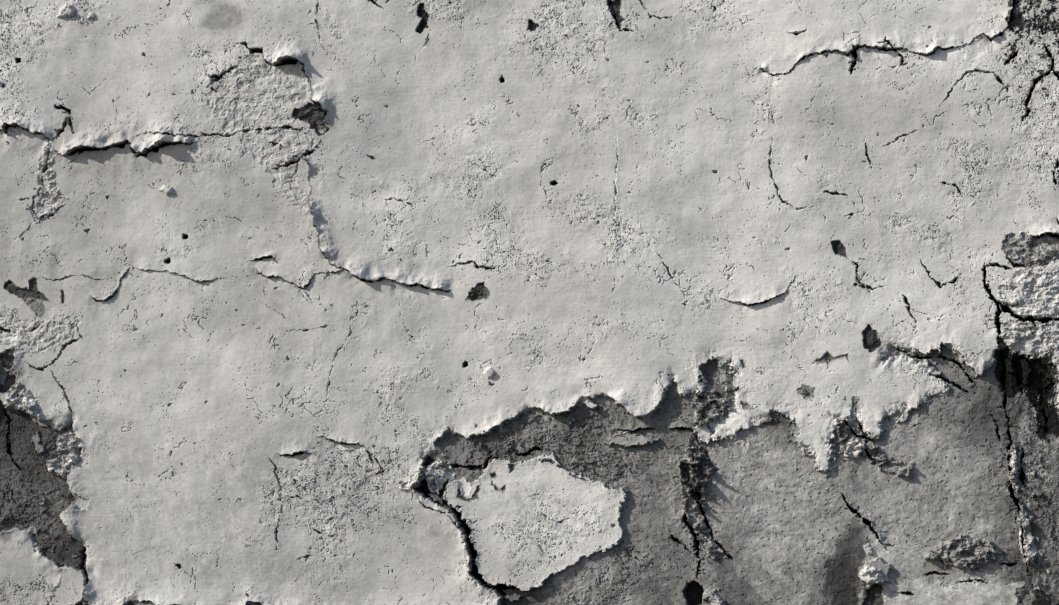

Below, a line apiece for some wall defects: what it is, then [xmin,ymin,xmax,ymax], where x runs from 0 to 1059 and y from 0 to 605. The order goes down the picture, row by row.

spalling [205,45,489,303]
crack [939,44,1059,127]
damp [1000,0,1059,85]
damp [1039,97,1059,214]
peeling [711,266,808,312]
crack [846,256,928,325]
spalling [998,212,1059,368]
peeling [0,277,157,605]
crack [669,489,735,580]
peeling [397,324,1059,605]
damp [709,346,1059,605]
crack [894,251,1059,605]